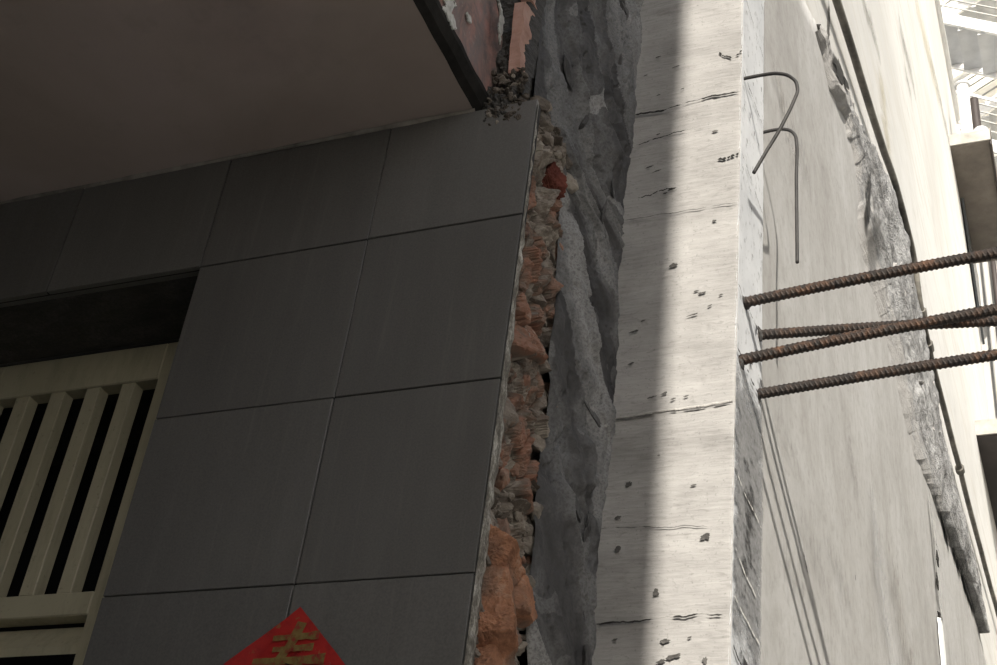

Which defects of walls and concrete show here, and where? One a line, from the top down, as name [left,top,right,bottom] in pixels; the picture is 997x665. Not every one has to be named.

peeling [442,0,472,30]
spalling [474,0,579,665]
flaking render [738,24,997,634]